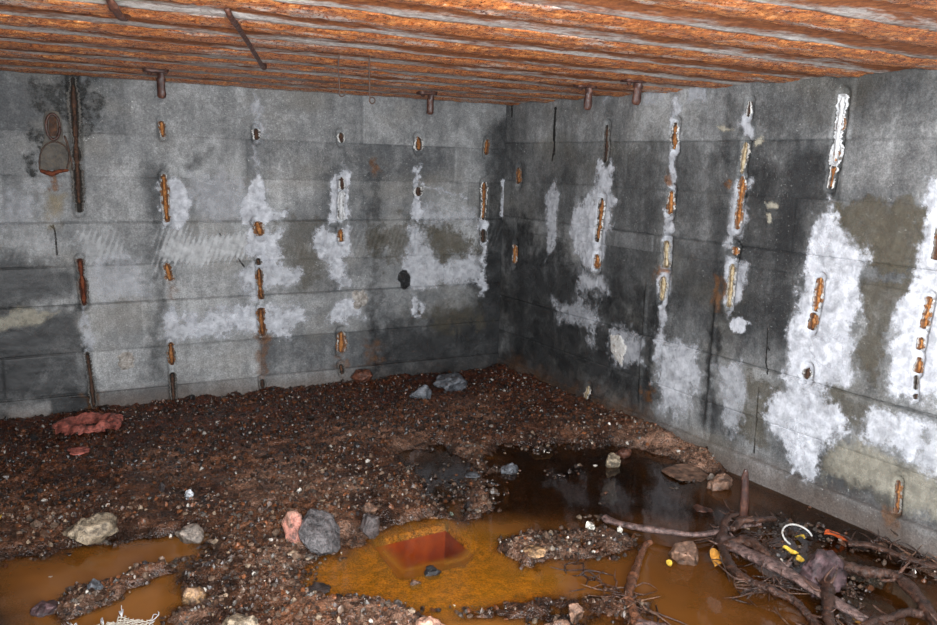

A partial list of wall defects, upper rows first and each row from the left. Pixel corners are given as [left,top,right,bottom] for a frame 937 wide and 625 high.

corrosion [40,169,69,191]
spalling [66,76,86,213]
damp [150,174,305,340]
spalling [255,258,267,336]
damp [313,170,351,287]
damp [327,123,753,426]
damp [667,97,681,191]
spalling [734,142,751,230]
spalling [807,278,824,330]
spalling [827,94,849,189]
damp [764,178,937,480]
spalling [912,296,935,399]